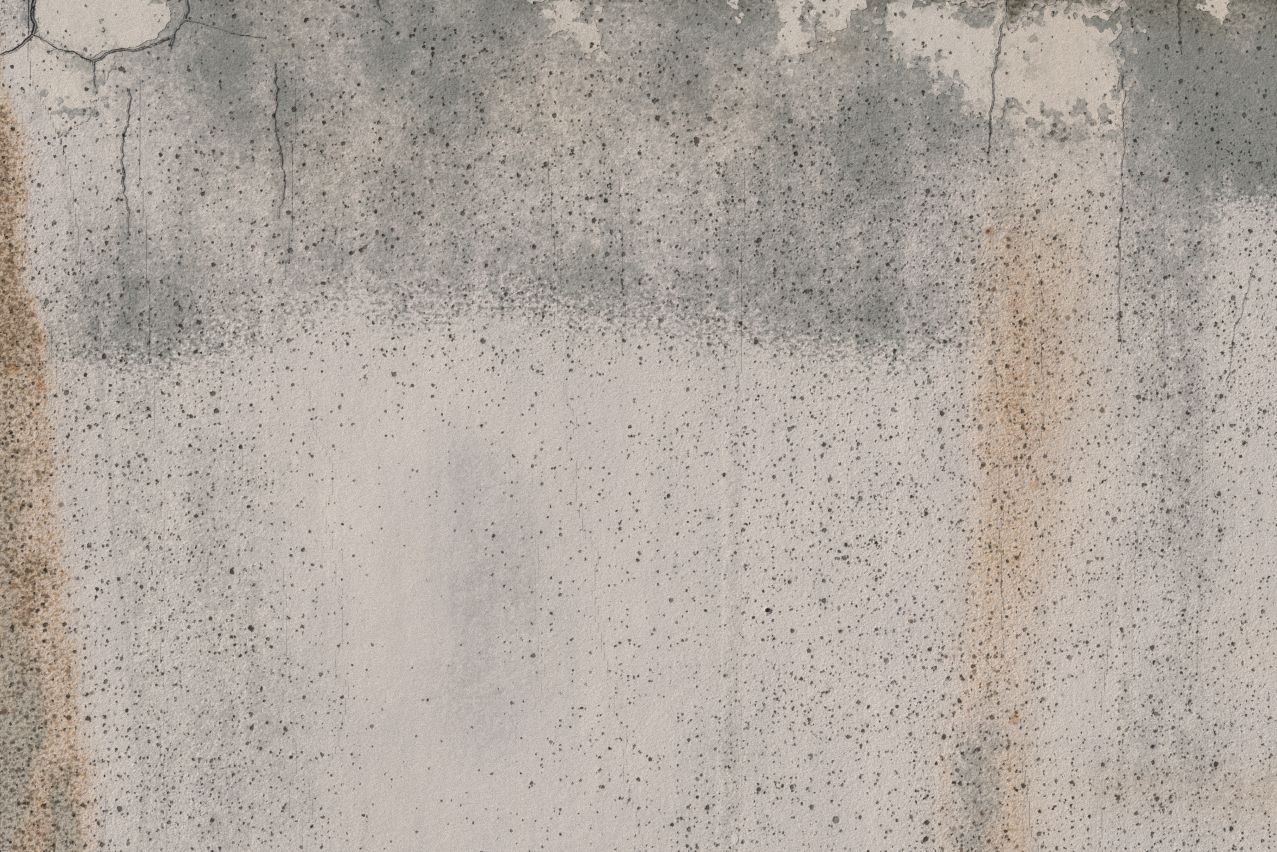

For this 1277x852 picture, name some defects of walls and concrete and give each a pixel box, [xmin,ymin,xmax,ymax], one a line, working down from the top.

peeling [28,0,171,137]
crack [0,0,285,235]
peeling [527,0,612,63]
peeling [727,0,745,24]
peeling [766,0,1146,154]
crack [987,0,1009,156]
rust [0,0,146,852]
water stain [28,0,1014,852]
rust [863,120,1165,852]